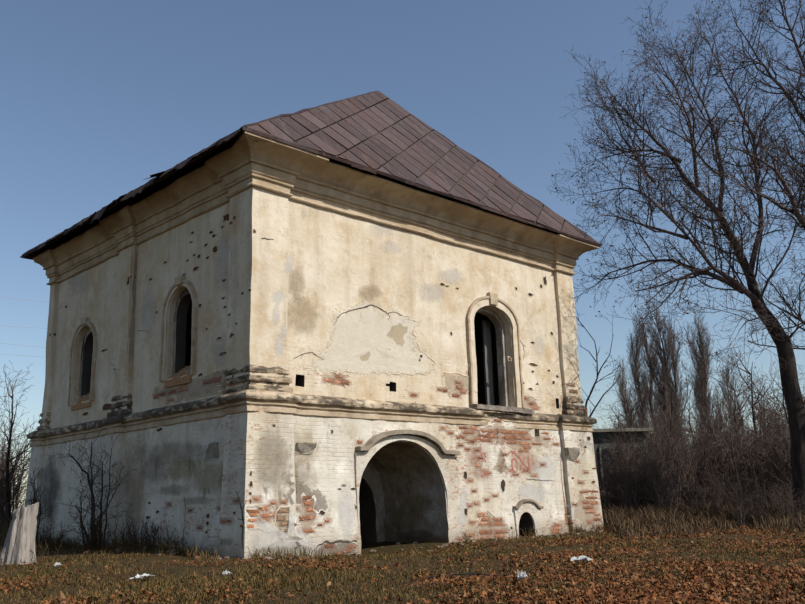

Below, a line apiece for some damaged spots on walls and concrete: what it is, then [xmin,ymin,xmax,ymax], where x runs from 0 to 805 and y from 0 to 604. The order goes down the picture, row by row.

crack [336,304,402,322]
flaking render [294,297,470,397]
flaking render [240,470,330,543]
flaking render [441,419,559,541]
flaking render [550,468,601,534]